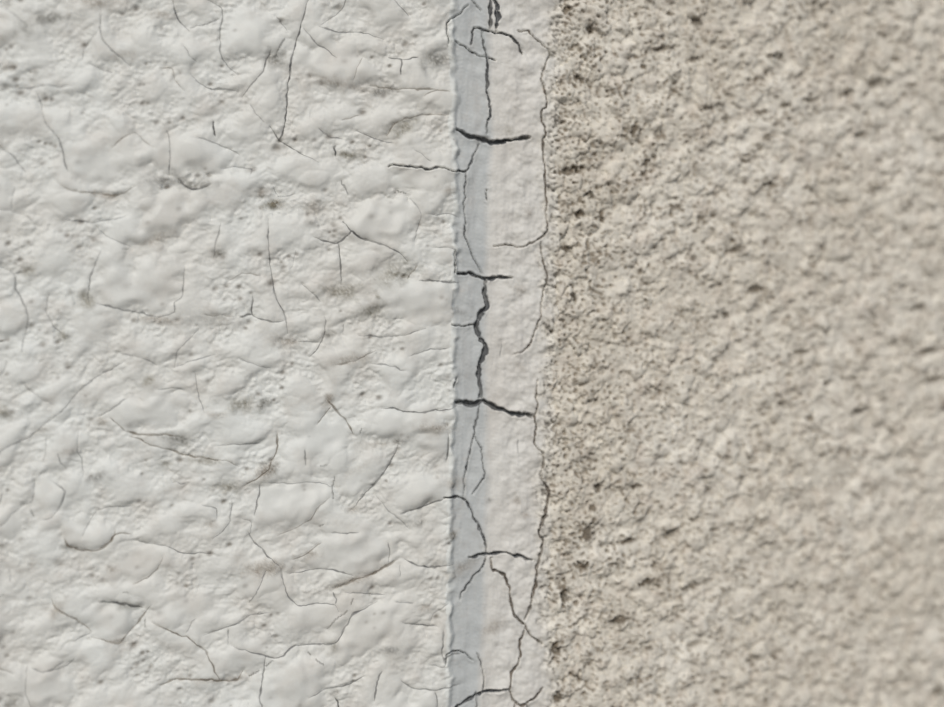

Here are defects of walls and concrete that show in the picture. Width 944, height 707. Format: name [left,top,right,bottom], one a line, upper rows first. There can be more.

crack [276,9,366,150]
crack [390,0,550,707]
crack [164,628,226,681]
crack [251,609,363,658]